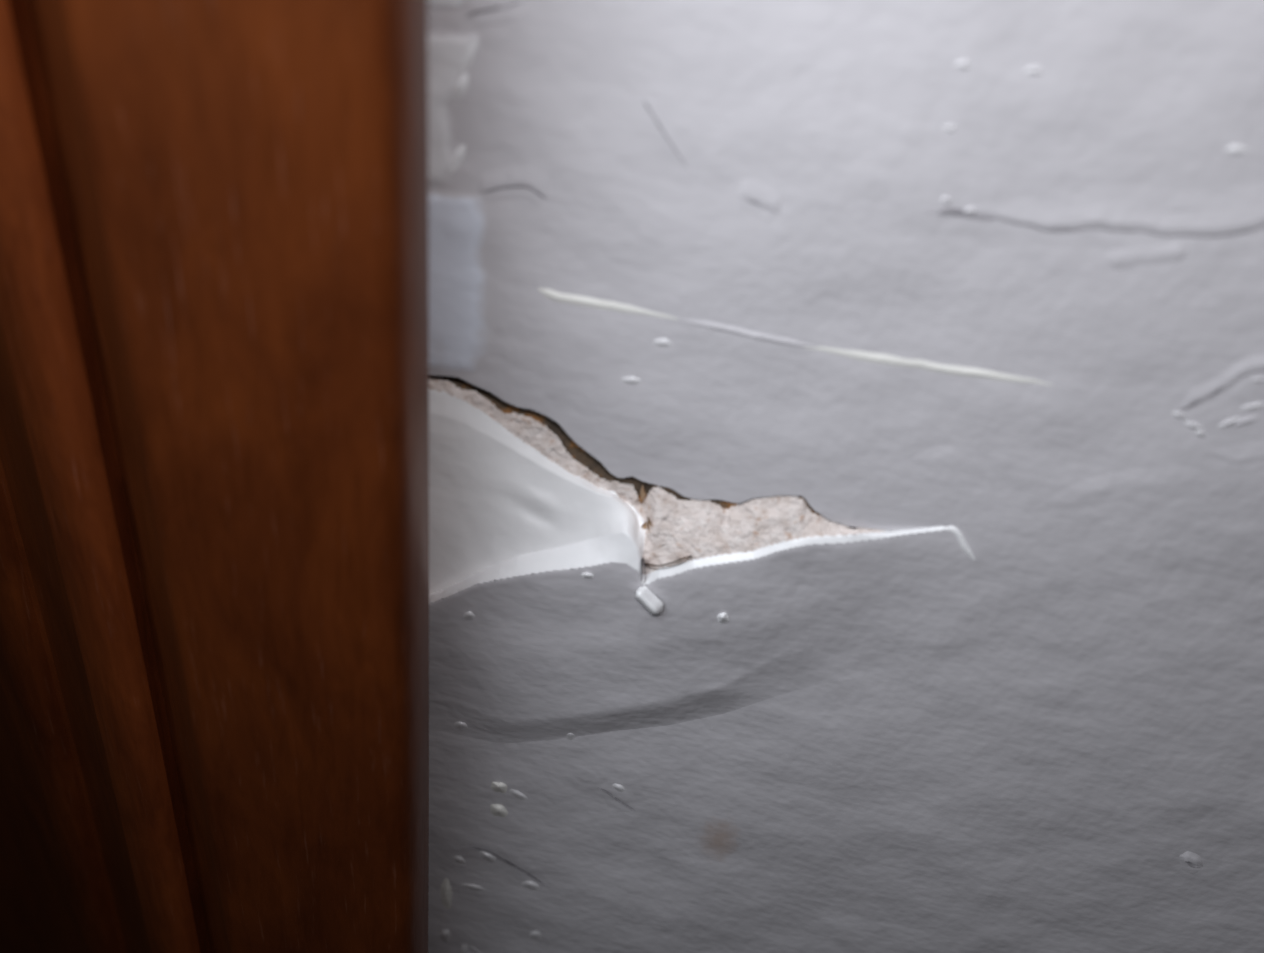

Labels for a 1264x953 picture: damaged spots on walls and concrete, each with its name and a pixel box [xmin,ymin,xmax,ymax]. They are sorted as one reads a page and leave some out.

flaking render [429,375,975,616]